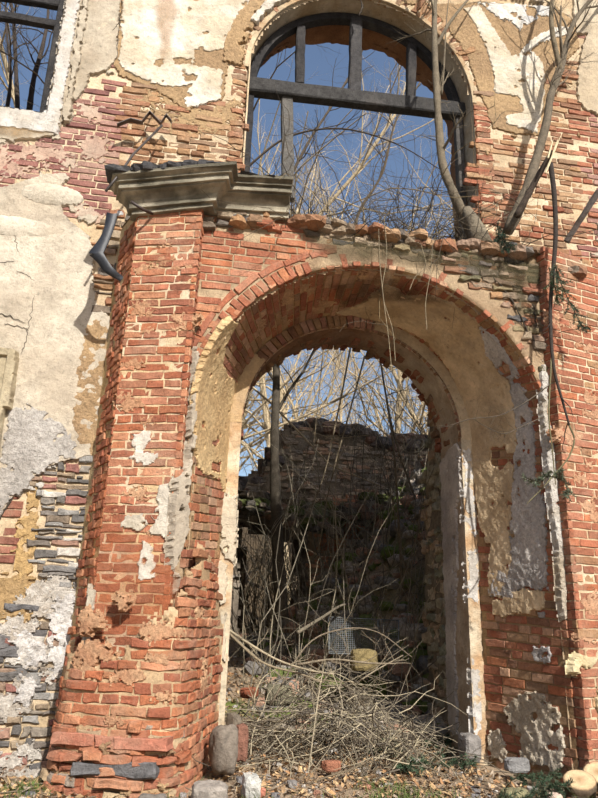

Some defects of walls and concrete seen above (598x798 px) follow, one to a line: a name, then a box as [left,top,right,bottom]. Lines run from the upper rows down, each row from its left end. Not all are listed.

crack [0,239,35,353]
peeling [0,0,297,798]
peeling [279,269,598,773]
spalling [359,0,598,263]